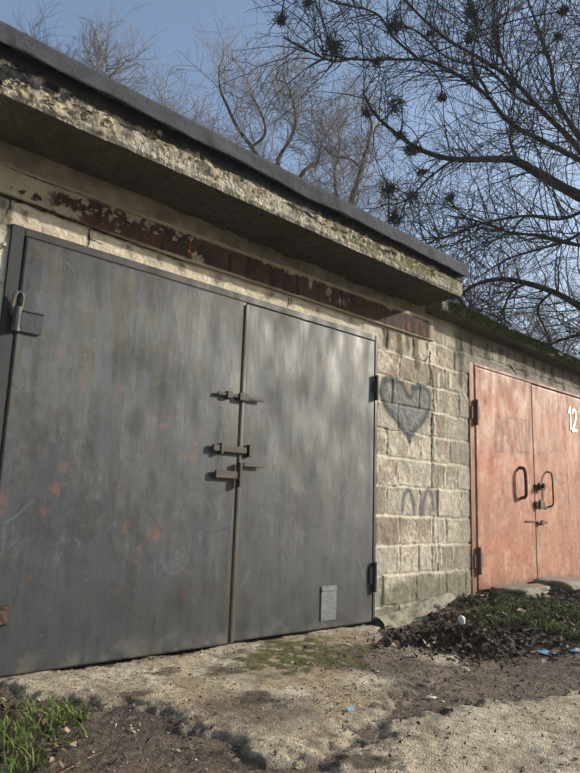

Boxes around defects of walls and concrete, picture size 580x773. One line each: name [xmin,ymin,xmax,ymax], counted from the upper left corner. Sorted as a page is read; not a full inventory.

spalling [0,57,123,140]
spalling [145,129,269,198]
peeling [77,199,204,261]
spalling [313,211,374,249]
spalling [389,246,420,269]